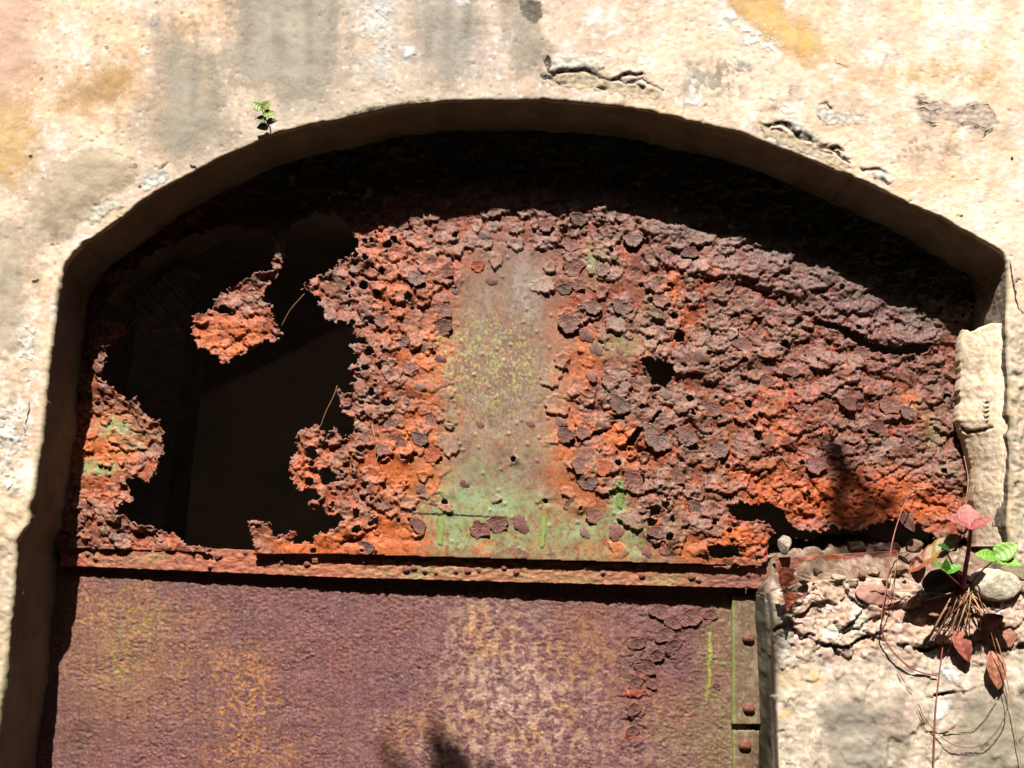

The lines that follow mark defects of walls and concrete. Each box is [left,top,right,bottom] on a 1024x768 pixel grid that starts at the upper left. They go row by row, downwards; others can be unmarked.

crack [540,55,664,90]
spalling [916,96,999,135]
spalling [760,120,851,170]
corrosion [623,235,642,247]
corrosion [556,238,633,356]
corrosion [396,265,460,392]
corrosion [375,413,442,463]
corrosion [643,422,699,452]
corrosion [805,442,843,475]
corrosion [470,514,530,539]
corrosion [648,604,718,643]
spalling [820,601,868,644]